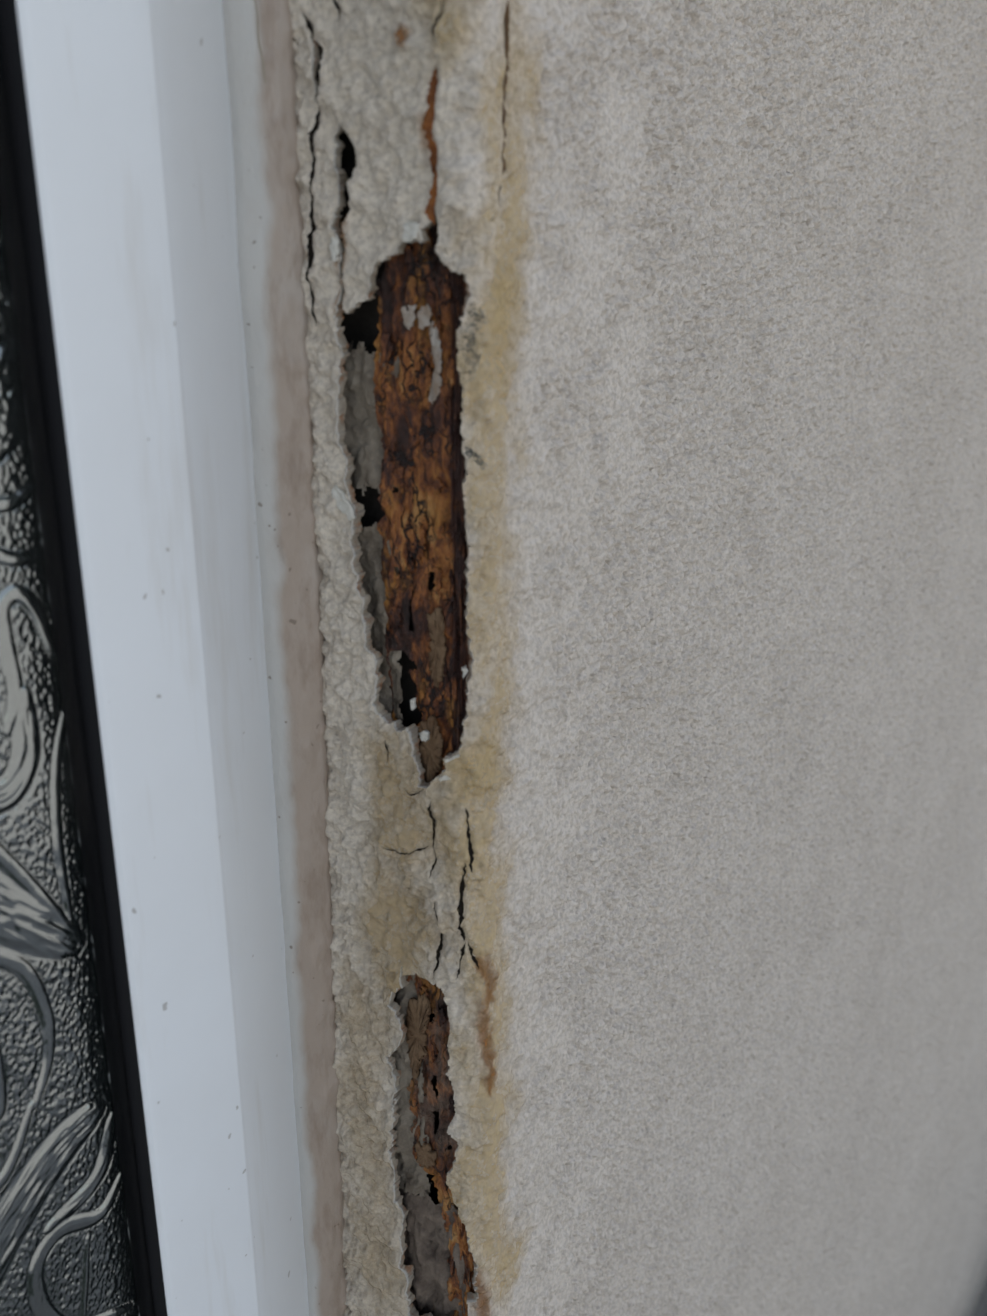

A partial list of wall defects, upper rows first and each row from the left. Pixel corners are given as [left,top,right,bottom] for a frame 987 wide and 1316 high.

crack [254,0,266,83]
crack [293,0,341,326]
crack [422,1,444,224]
crack [491,0,510,221]
spalling [329,123,486,791]
rust [426,567,458,702]
rust [418,715,445,783]
crack [381,789,479,979]
rust [406,985,448,1079]
spalling [386,967,479,1316]
rust [449,747,521,1316]